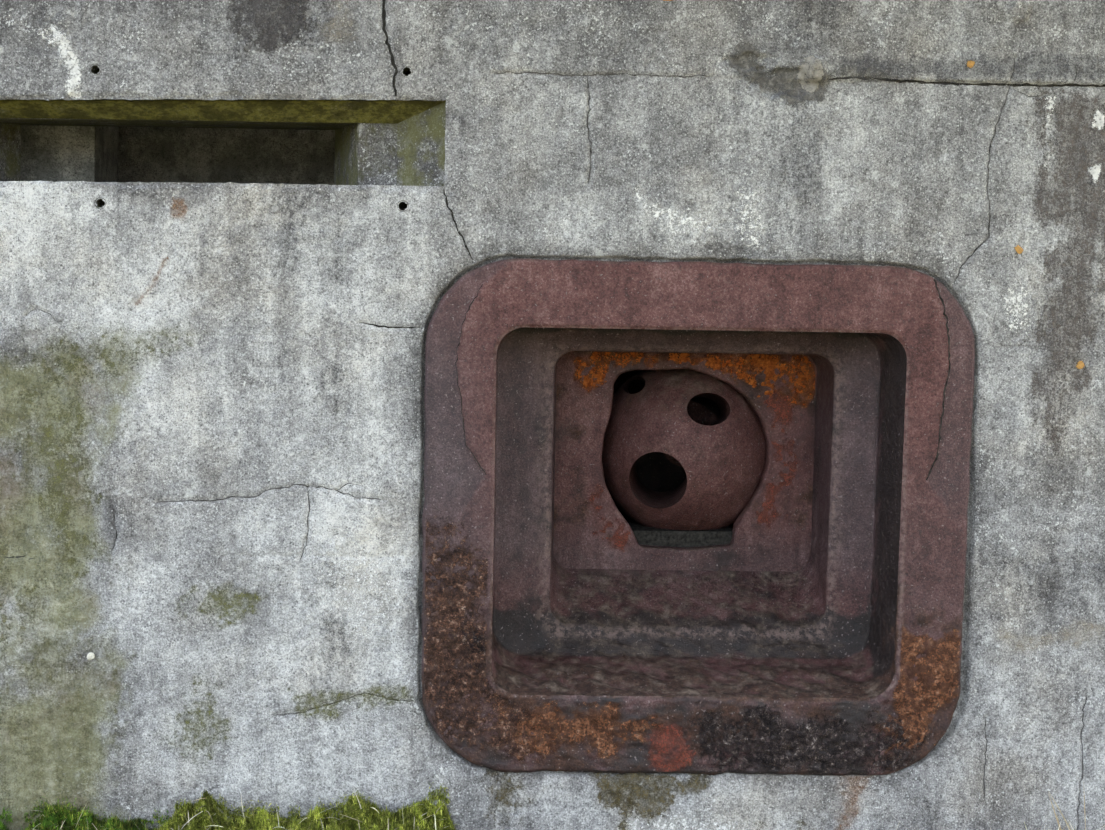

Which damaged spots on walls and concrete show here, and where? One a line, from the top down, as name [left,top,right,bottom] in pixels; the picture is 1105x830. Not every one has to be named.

efflorescence [37,24,84,99]
damp [227,0,316,58]
crack [497,71,712,184]
crack [829,58,1105,480]
damp [840,53,1105,454]
corrosion [574,352,816,411]
damp [15,399,103,606]
crack [159,483,381,562]
corrosion [424,517,960,830]